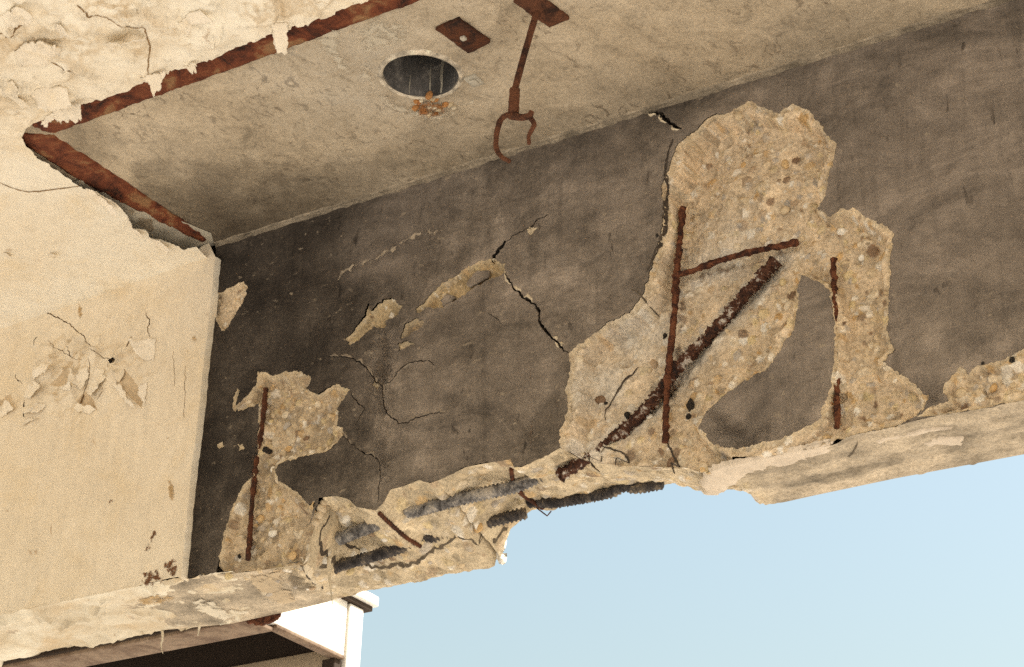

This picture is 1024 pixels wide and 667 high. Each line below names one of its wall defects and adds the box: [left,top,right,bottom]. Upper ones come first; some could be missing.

peeling [2,80,82,127]
peeling [140,70,166,98]
rust [22,0,419,242]
peeling [271,22,288,55]
rust [411,90,457,117]
crack [1,181,81,193]
spalling [215,281,248,331]
spalling [345,258,506,350]
crack [492,214,569,353]
spalling [559,101,1024,474]
crack [330,354,444,502]
spalling [219,371,350,604]